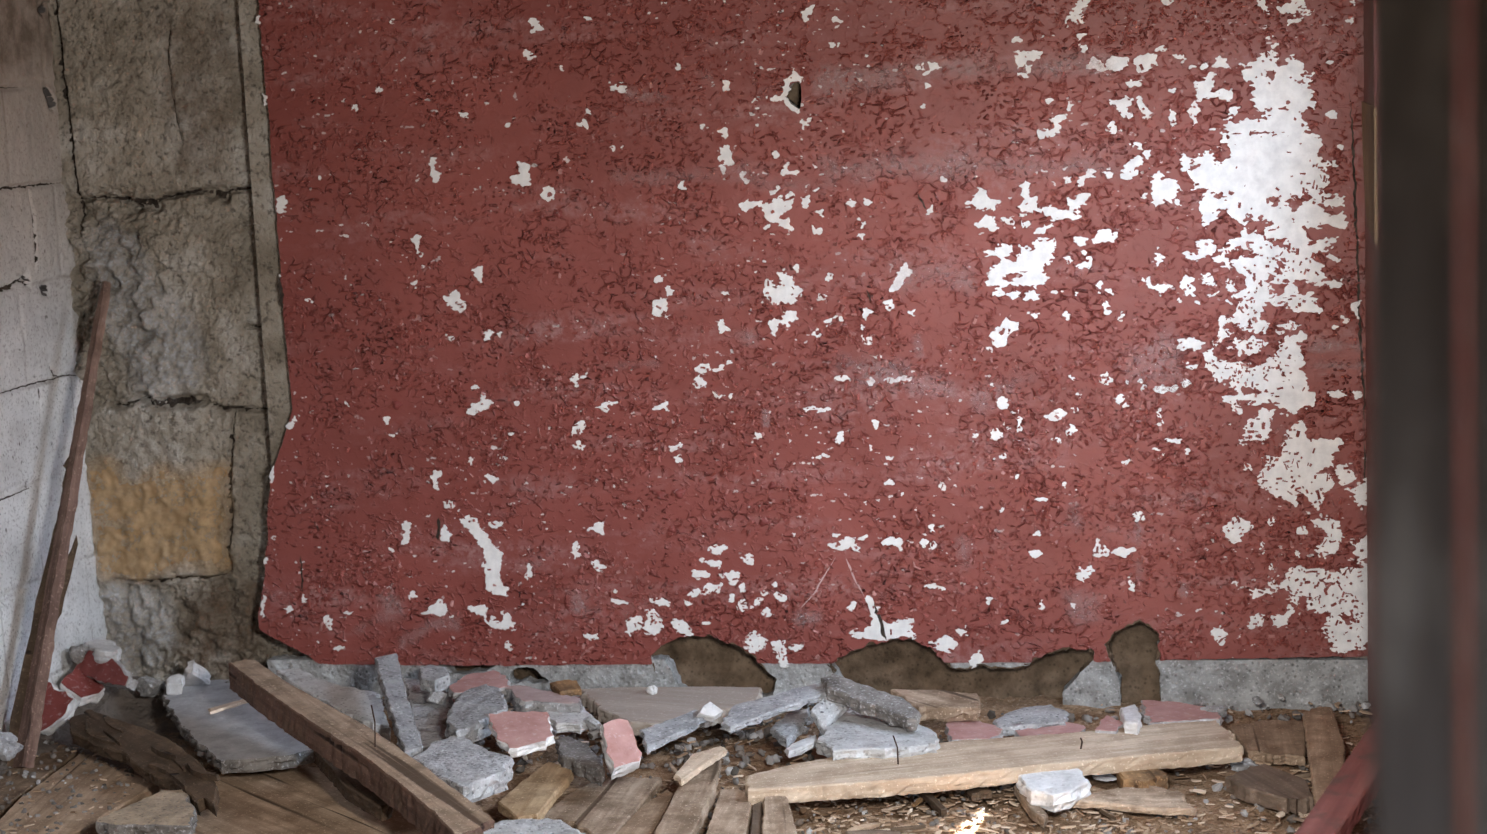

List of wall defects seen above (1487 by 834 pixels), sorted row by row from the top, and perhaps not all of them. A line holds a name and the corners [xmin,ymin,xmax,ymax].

crack [0,3,252,292]
peeling [510,161,555,202]
peeling [700,124,824,235]
peeling [751,68,812,130]
peeling [763,264,833,337]
peeling [811,262,916,359]
peeling [965,0,1368,653]
crack [1,367,76,398]
peeling [408,470,524,651]
spalling [611,535,804,693]
peeling [827,524,937,552]
spalling [827,595,1161,703]